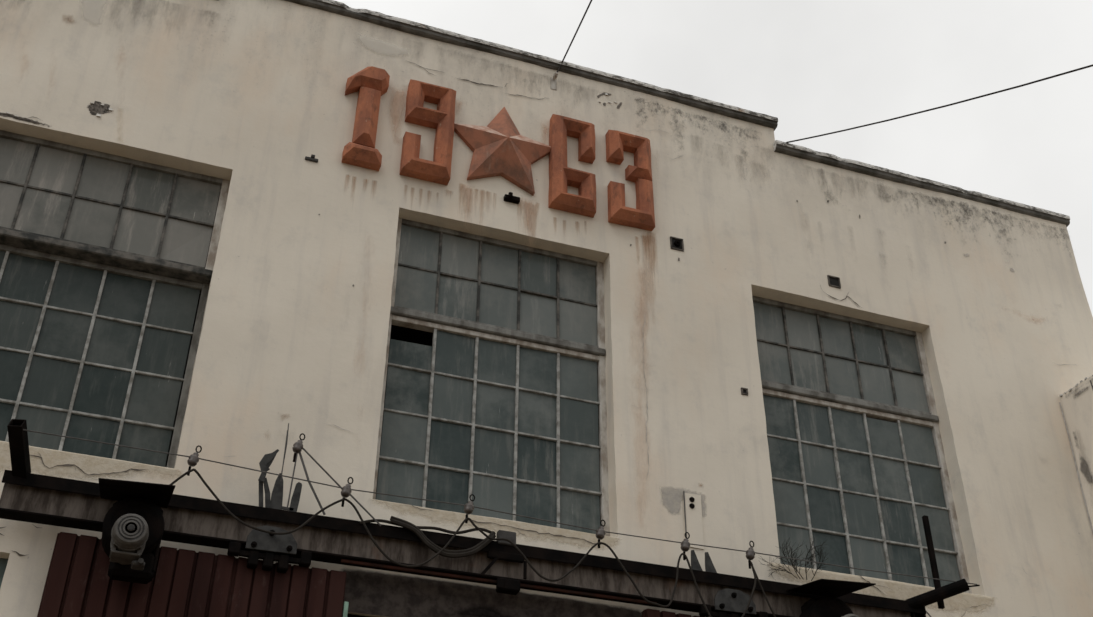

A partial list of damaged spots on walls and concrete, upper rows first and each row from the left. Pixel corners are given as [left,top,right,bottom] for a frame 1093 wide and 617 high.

spalling [88,101,113,117]
crack [30,455,146,480]